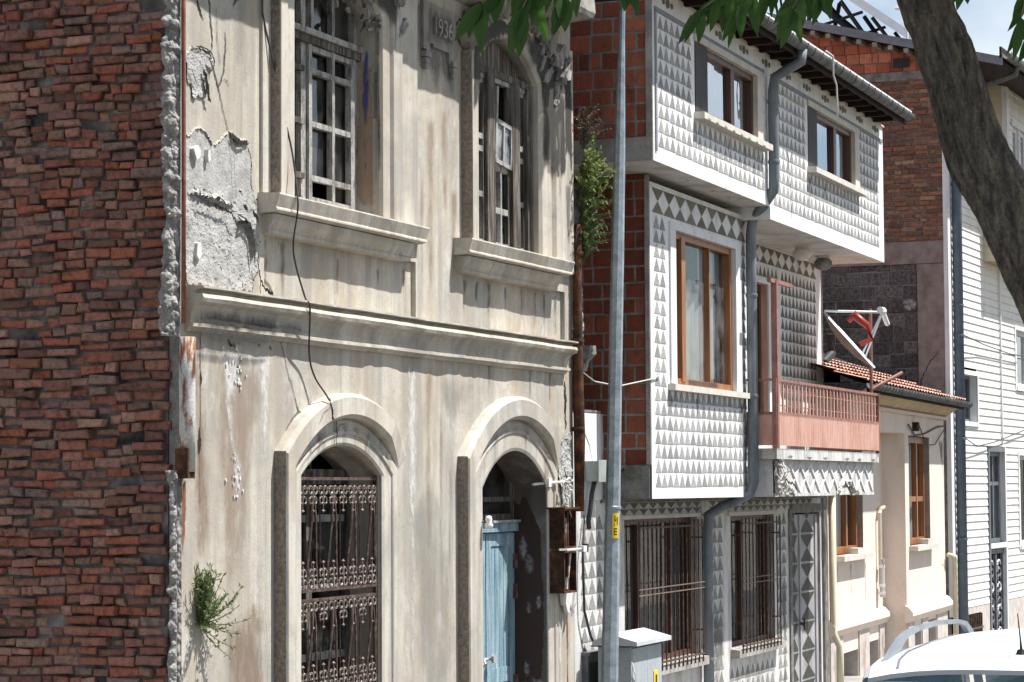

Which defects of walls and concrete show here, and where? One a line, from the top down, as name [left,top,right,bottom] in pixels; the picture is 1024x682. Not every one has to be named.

flaking render [186,45,215,103]
flaking render [186,126,261,292]